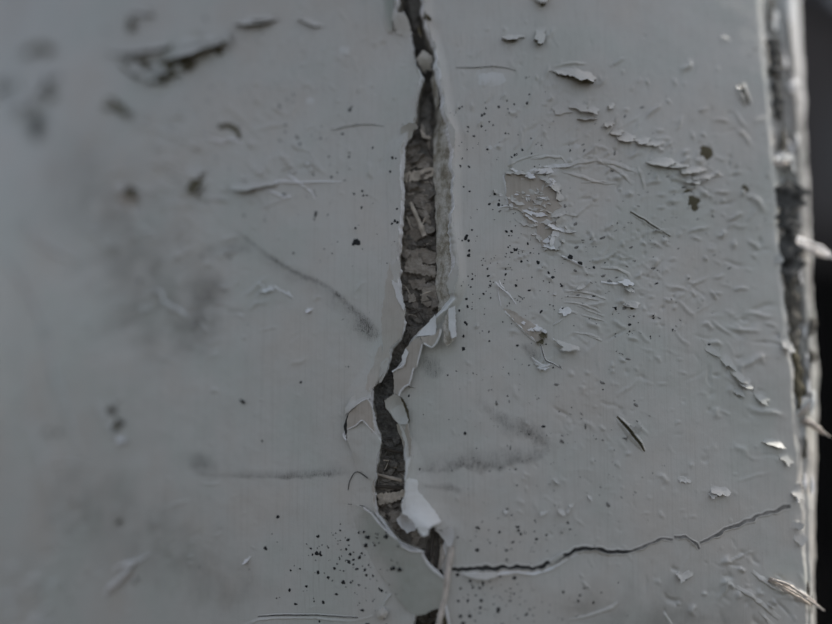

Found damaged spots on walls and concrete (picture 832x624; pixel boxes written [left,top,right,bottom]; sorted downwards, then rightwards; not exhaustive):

peeling [107,28,232,85]
peeling [549,61,596,84]
peeling [552,100,665,147]
peeling [493,153,723,267]
spalling [503,308,580,371]
crack [331,0,817,624]
peeling [601,266,640,310]